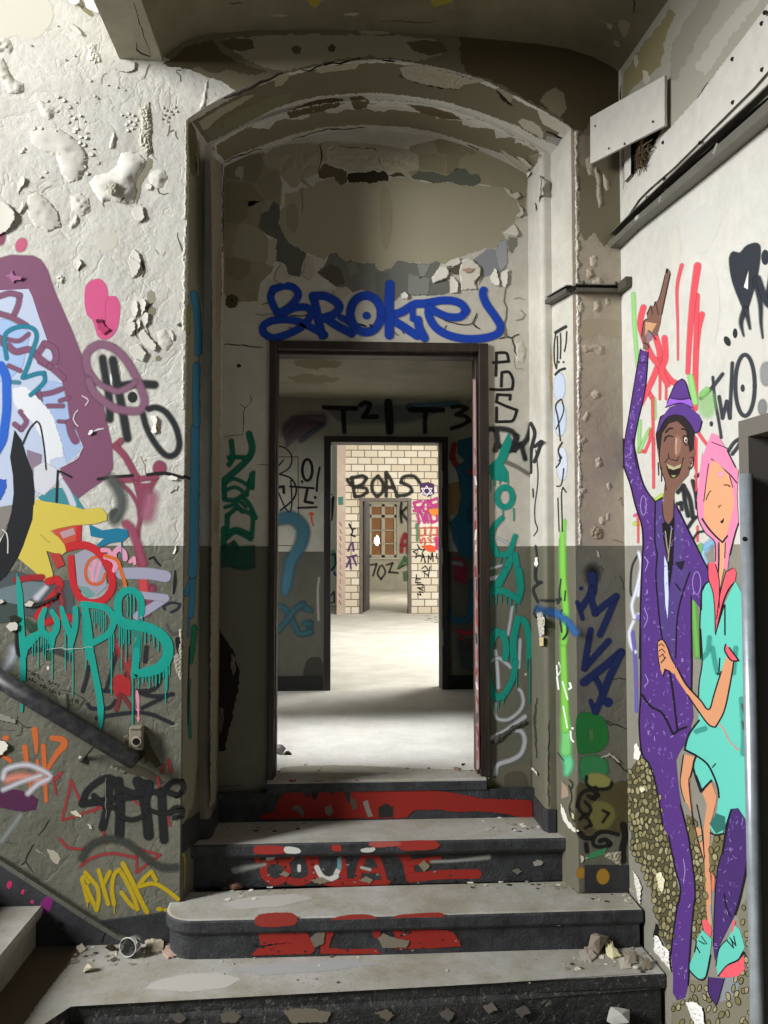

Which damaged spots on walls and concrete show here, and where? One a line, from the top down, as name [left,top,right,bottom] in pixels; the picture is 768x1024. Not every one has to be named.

peeling [112,59,135,72]
flaking render [316,62,361,74]
flaking render [399,64,483,89]
flaking render [496,88,513,106]
peeling [0,176,25,234]
flaking render [224,139,537,304]
peeling [128,249,141,278]
flaking render [132,94,255,410]
peeling [125,299,157,361]
flaking render [518,111,603,557]